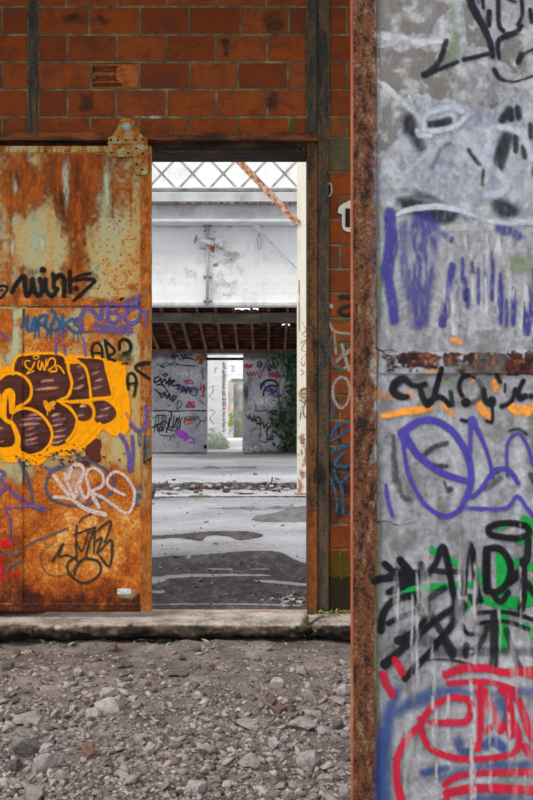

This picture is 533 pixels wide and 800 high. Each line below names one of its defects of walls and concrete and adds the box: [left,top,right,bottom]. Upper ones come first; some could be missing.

corrosion [0,153,152,366]
corrosion [375,314,533,394]
corrosion [0,452,151,612]